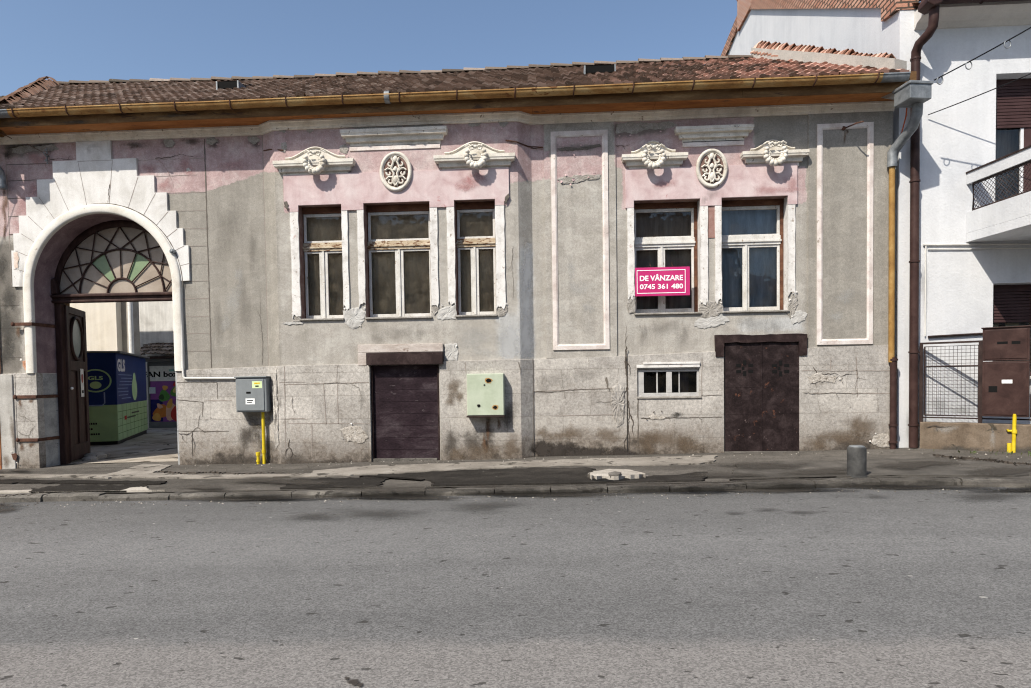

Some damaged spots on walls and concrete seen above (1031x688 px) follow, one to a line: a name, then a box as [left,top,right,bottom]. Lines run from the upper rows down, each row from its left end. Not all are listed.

peeling [557,140,601,156]
peeling [557,172,600,185]
spalling [343,307,366,329]
crack [518,323,702,451]
crack [158,412,304,474]
spalling [340,423,368,443]
water stain [446,427,492,457]
water stain [530,429,694,457]